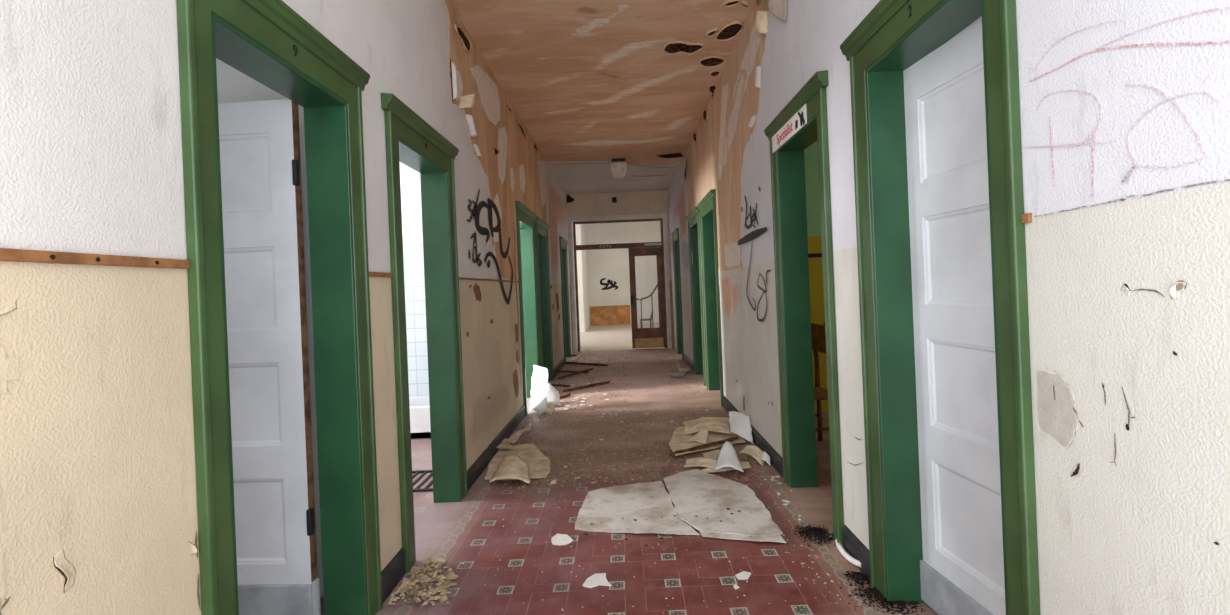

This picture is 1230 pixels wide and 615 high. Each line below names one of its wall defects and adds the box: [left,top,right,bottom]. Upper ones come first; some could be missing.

peeling [445,0,787,281]
peeling [53,549,76,593]